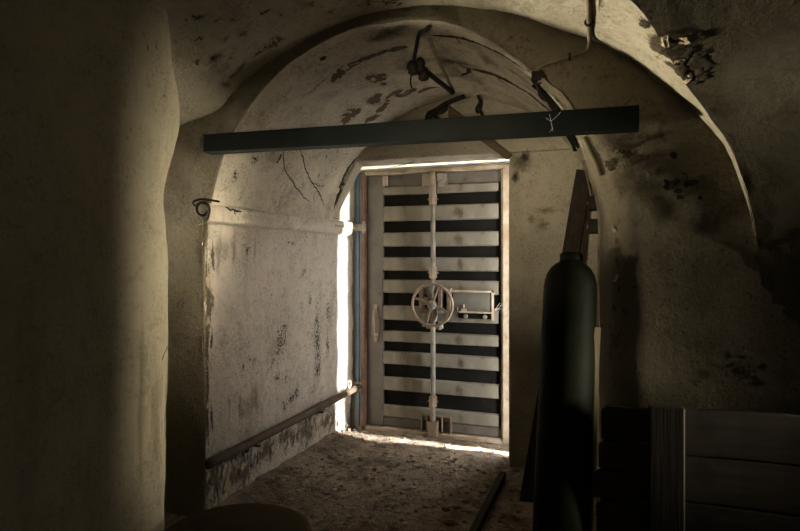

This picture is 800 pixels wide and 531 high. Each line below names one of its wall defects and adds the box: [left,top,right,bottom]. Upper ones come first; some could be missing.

spalling [639,19,714,87]
crack [276,151,325,207]
water stain [309,296,330,385]